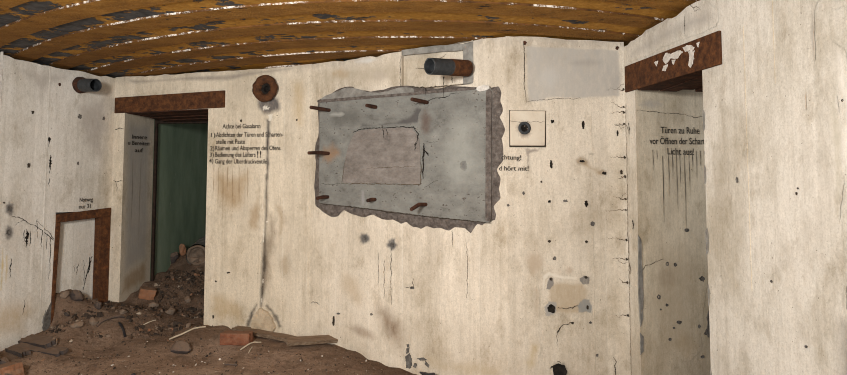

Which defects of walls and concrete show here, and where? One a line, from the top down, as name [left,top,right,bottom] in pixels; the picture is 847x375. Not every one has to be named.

peeling [654,42,700,71]
corrosion [320,140,343,166]
leakage [210,117,290,308]
leakage [642,150,708,375]
leakage [206,289,246,326]